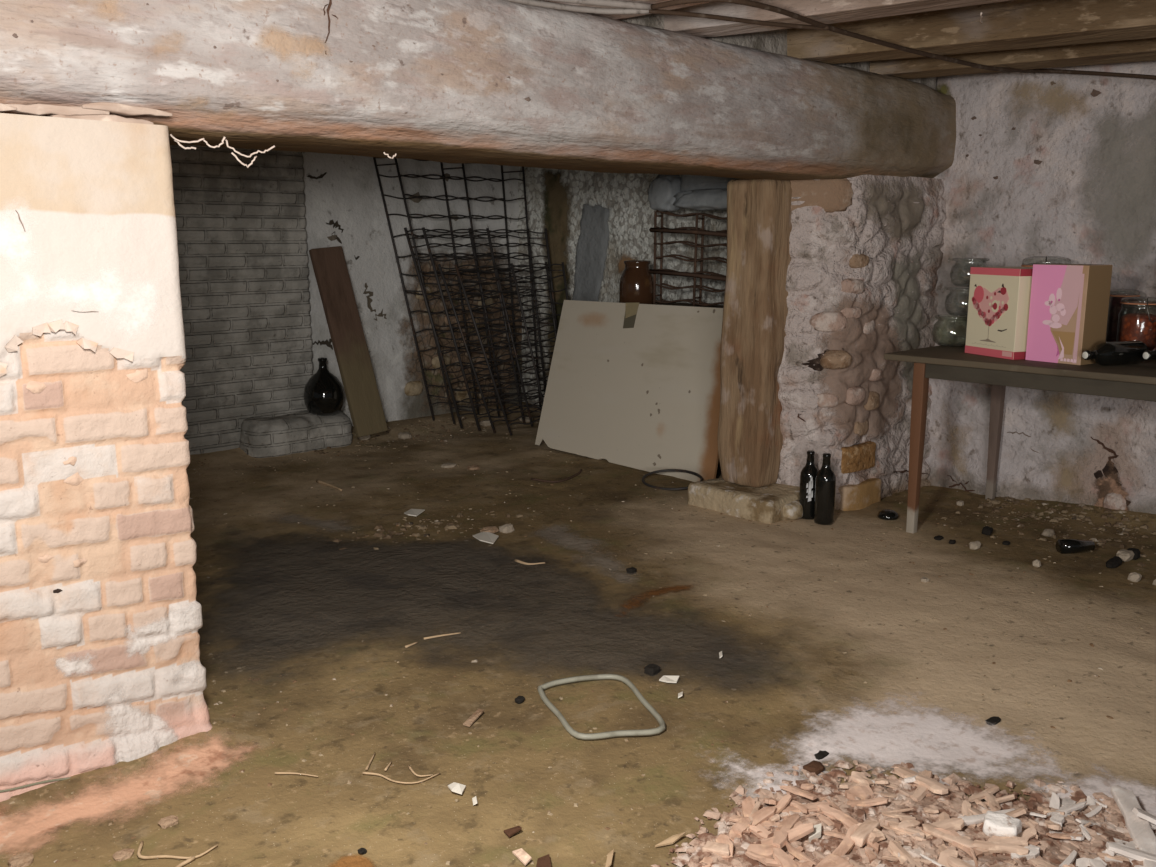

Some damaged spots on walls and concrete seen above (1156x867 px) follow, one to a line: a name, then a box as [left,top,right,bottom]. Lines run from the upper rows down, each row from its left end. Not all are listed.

crack [323,0,338,54]
peeling [0,319,148,383]
spalling [1094,461,1131,511]
water stain [212,515,780,688]
water stain [126,606,199,656]
water stain [56,657,91,675]
water stain [107,691,177,764]